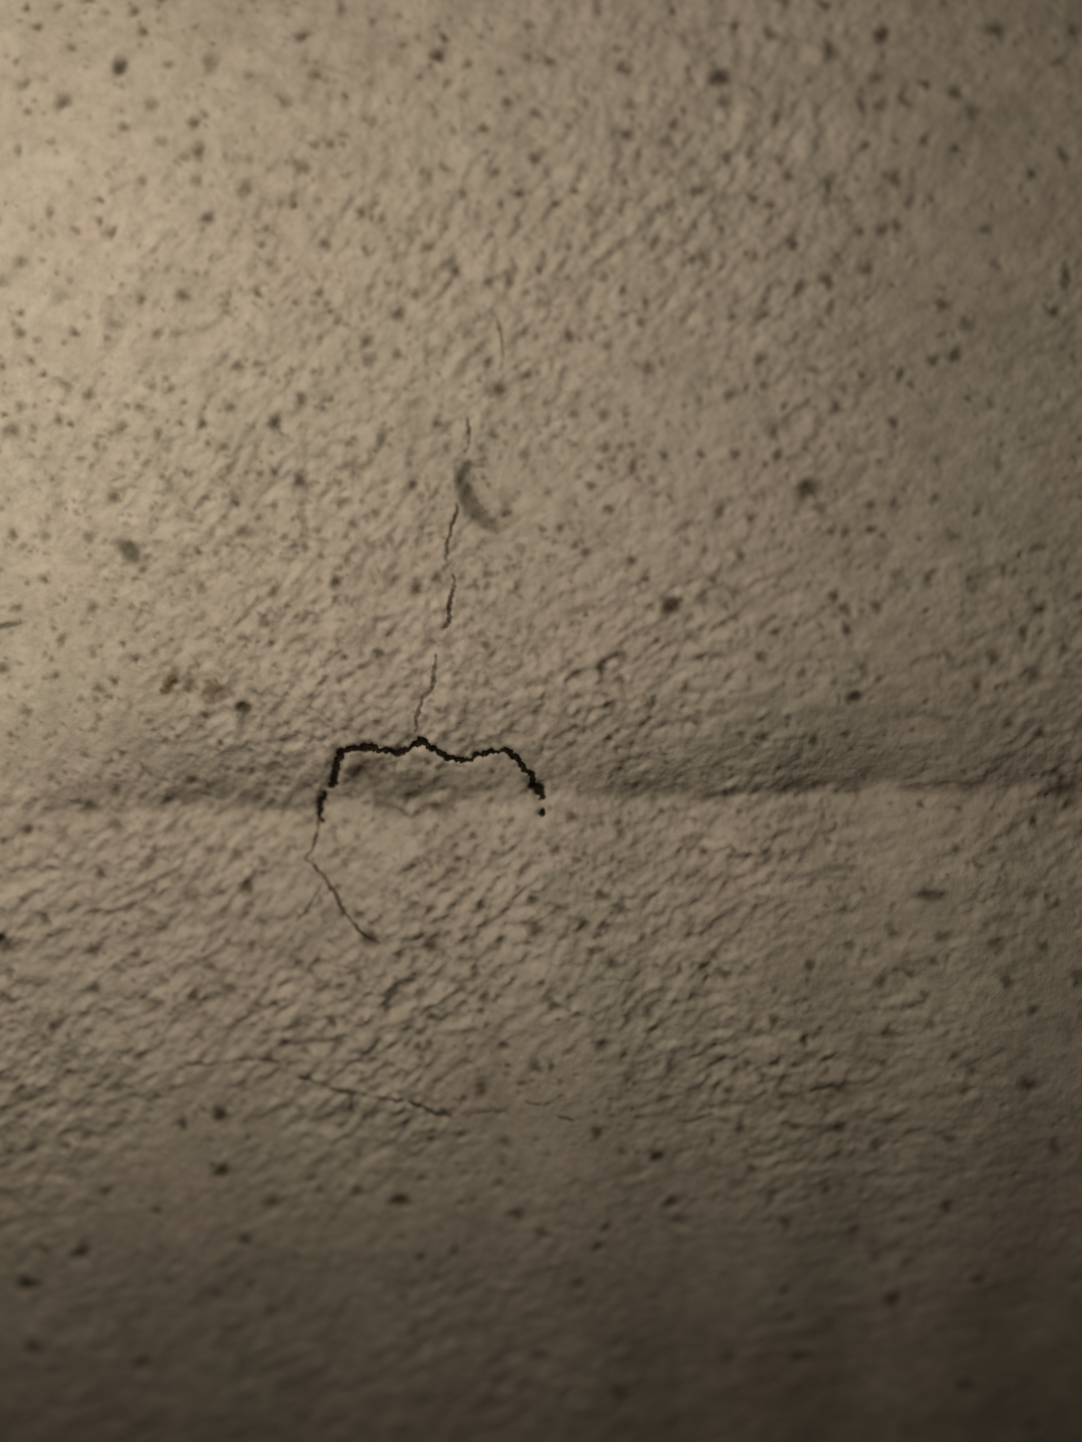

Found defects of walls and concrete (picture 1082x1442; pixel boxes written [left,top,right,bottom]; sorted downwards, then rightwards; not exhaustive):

crack [311,508,546,940]